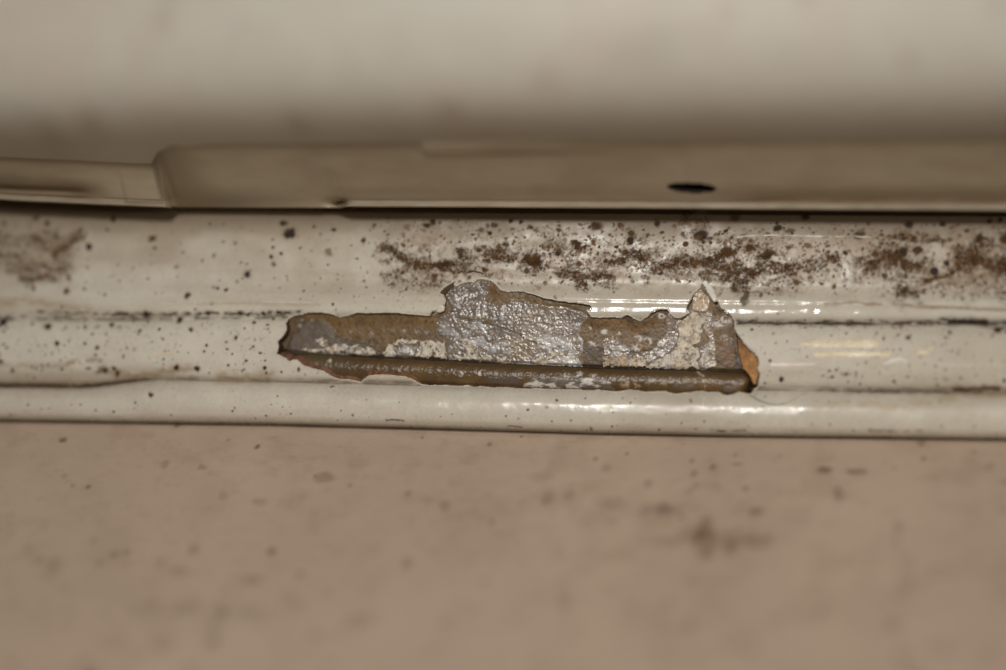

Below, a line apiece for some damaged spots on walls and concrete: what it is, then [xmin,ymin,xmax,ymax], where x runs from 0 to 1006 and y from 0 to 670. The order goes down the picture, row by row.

peeling [275,278,761,397]